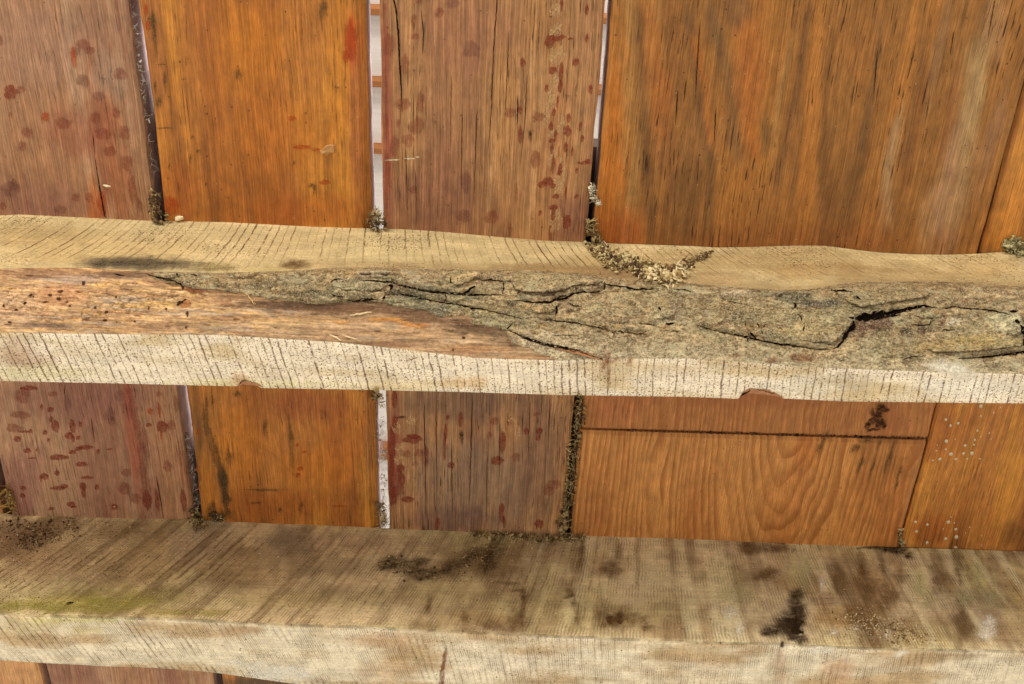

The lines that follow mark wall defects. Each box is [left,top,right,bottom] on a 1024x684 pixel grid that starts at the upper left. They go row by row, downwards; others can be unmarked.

crack [331,277,1024,361]
water stain [762,590,834,653]